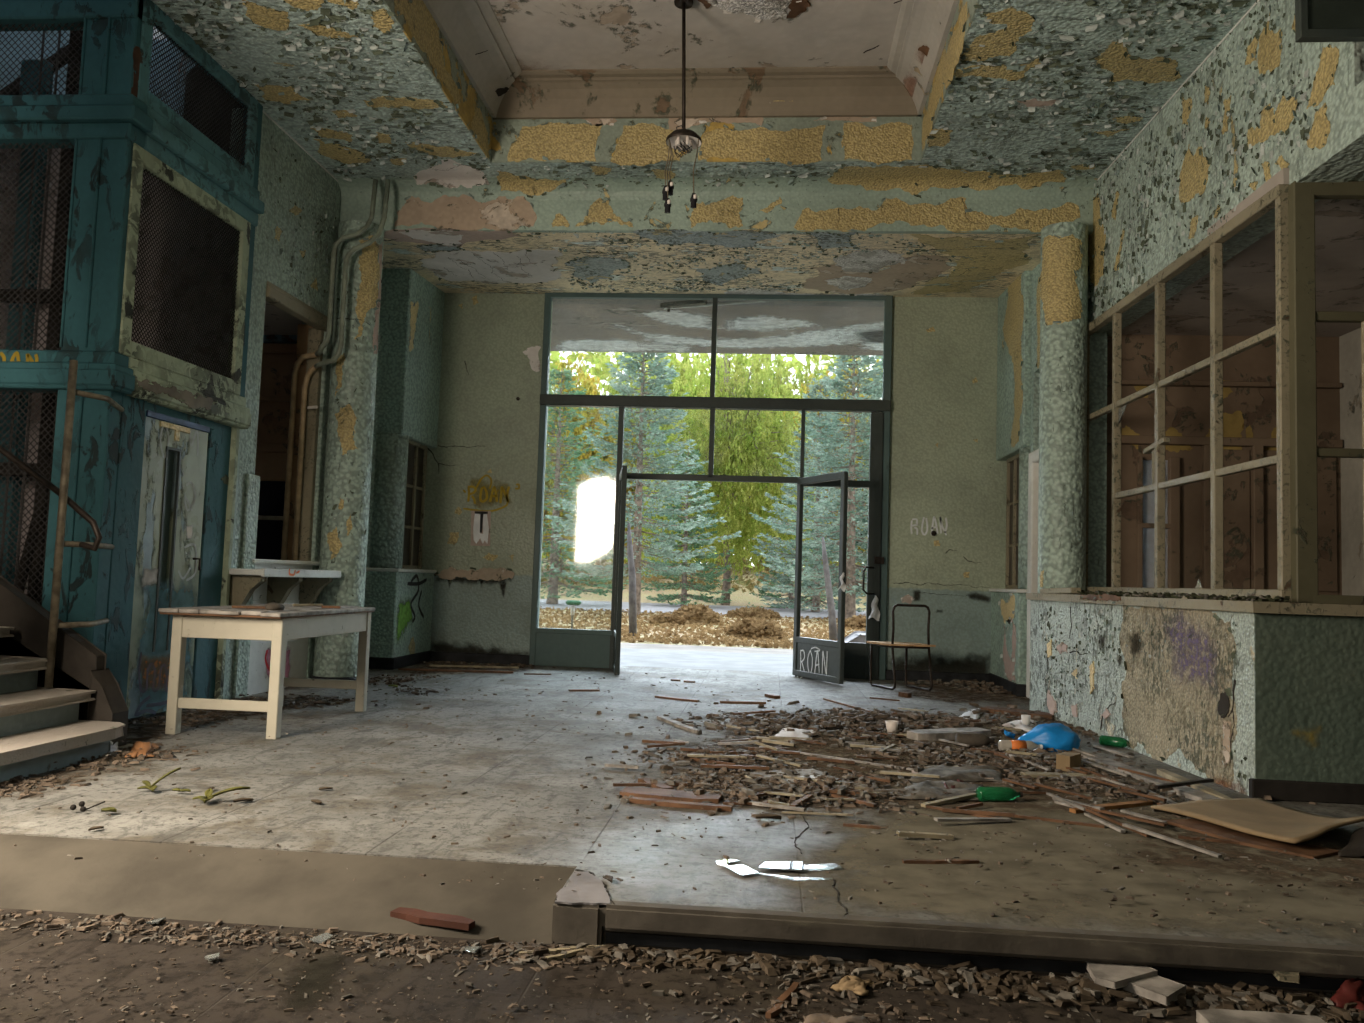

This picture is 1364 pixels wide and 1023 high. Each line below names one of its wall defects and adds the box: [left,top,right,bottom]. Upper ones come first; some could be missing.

peeling [158,0,1339,457]
peeling [326,474,366,559]
peeling [1040,591,1247,787]